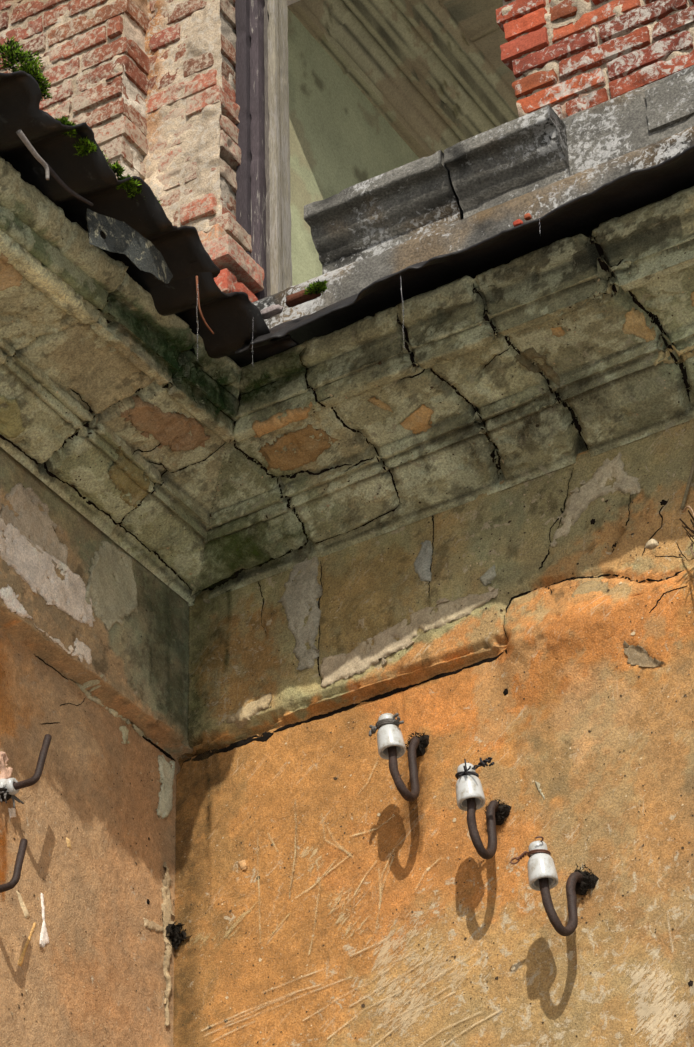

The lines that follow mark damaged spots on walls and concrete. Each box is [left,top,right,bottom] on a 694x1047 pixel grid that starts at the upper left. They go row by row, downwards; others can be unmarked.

crack [589,236,691,401]
flaking render [0,751,13,779]
crack [33,654,85,724]
peeling [0,483,148,664]
peeling [63,651,192,865]
peeling [115,394,212,465]
crack [0,348,400,683]
peeling [159,389,347,557]
peeling [270,534,520,688]
crack [142,283,687,768]
peeling [521,452,660,547]